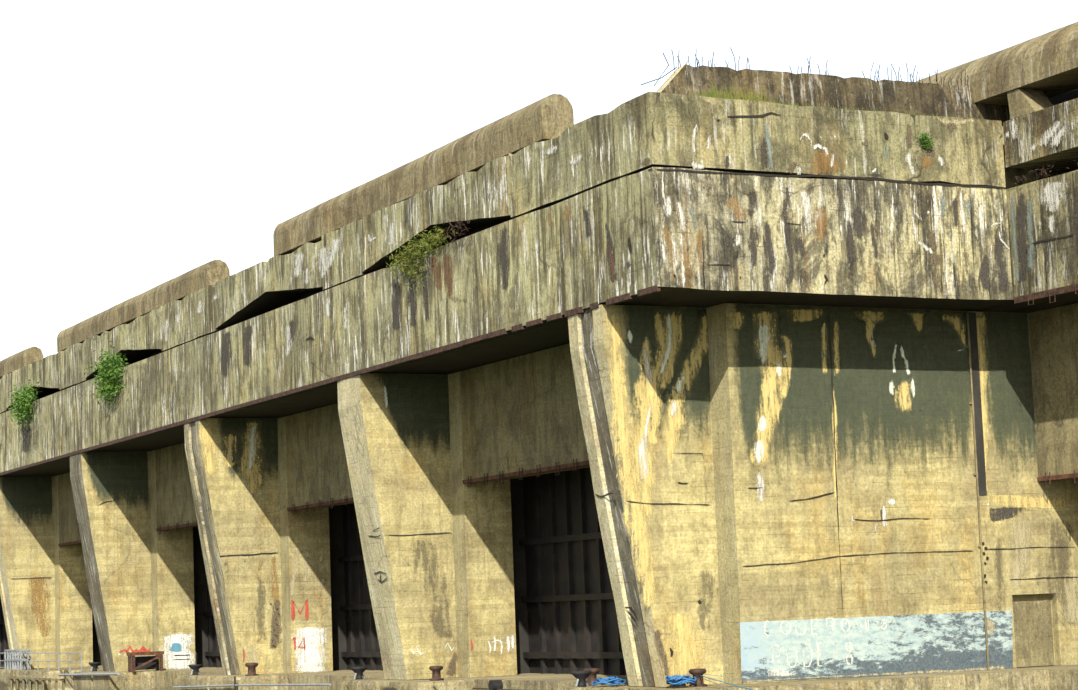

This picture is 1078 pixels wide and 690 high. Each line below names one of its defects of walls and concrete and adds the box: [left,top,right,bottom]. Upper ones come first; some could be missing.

damp [1032,121,1075,151]
damp [721,187,812,283]
damp [846,206,878,263]
damp [941,196,970,227]
damp [606,306,710,607]
damp [729,304,1074,623]